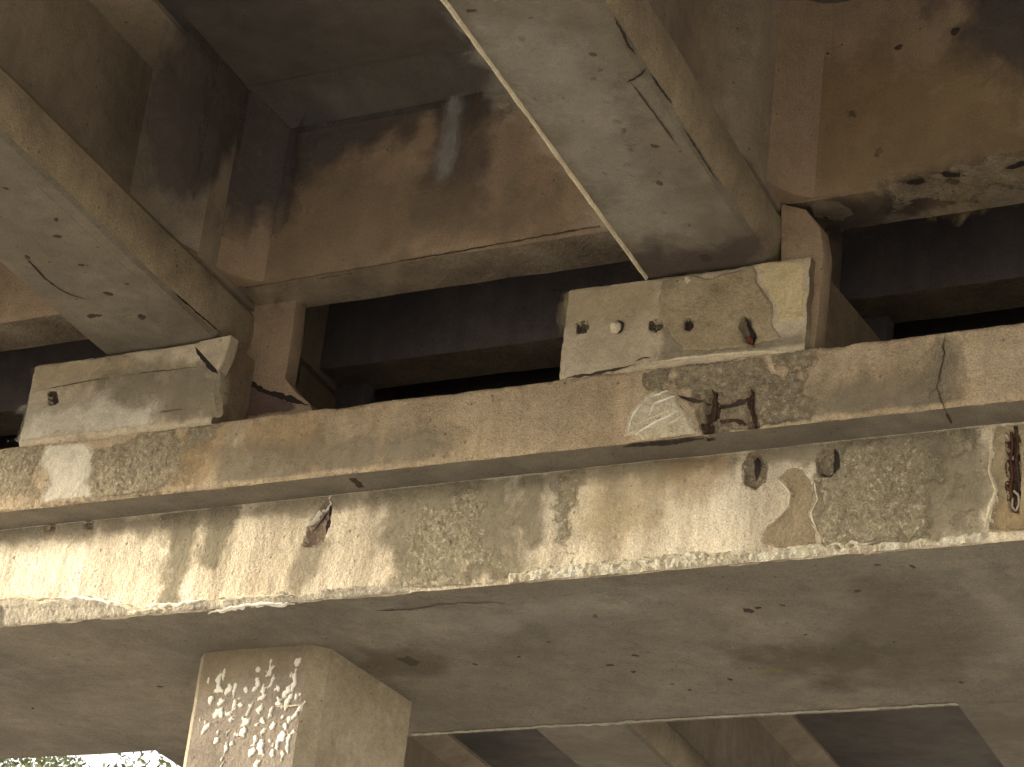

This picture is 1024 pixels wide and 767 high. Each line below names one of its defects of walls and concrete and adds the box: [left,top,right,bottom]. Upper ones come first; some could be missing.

water stain [413,95,485,217]
crack [614,17,718,181]
crack [28,260,82,299]
crack [37,347,218,391]
crack [251,381,308,405]
spalling [624,316,816,441]
crack [929,335,952,424]
spalling [742,434,946,549]
spalling [985,424,1024,532]
peeling [0,485,510,626]